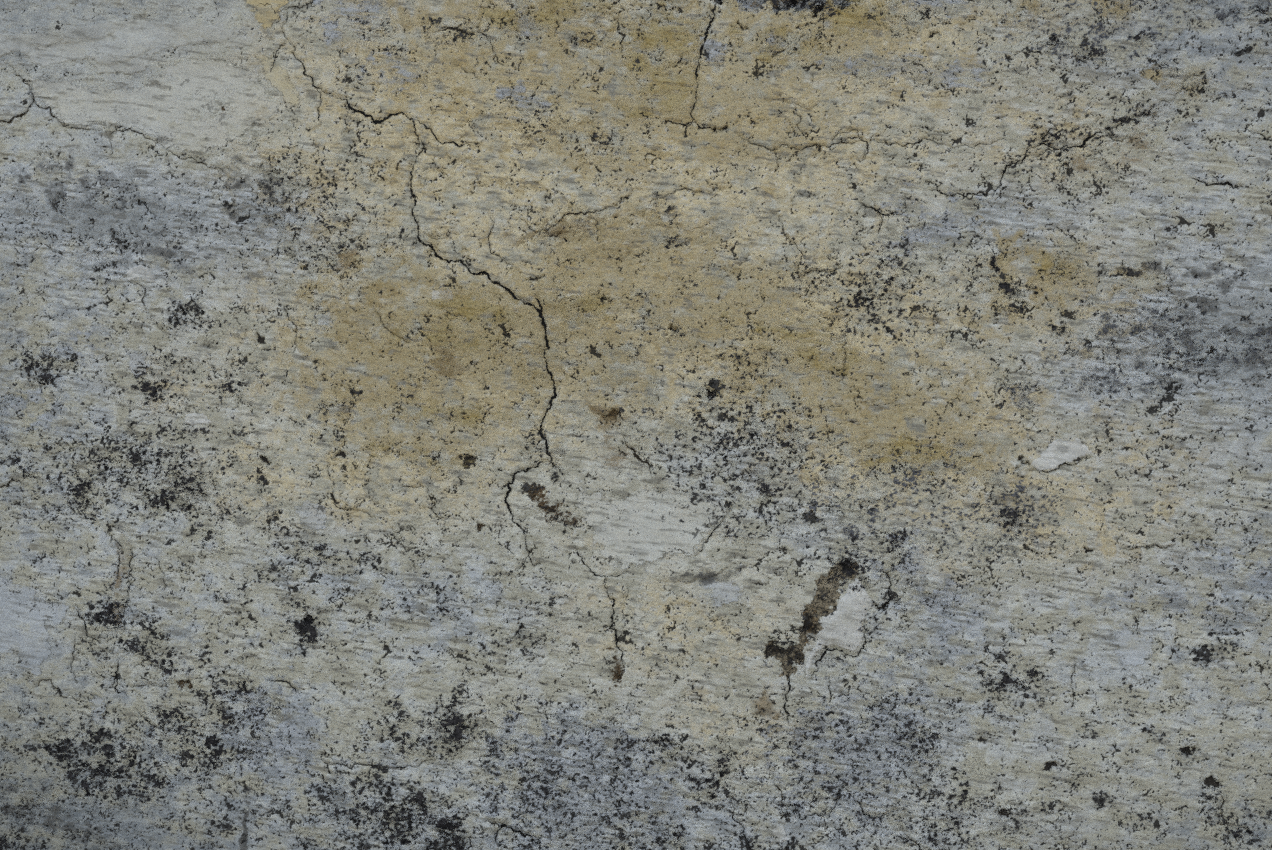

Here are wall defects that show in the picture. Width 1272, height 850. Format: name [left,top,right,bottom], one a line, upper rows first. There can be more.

spalling [738,0,860,18]
crack [0,65,223,172]
crack [258,0,730,571]
crack [575,548,629,683]
peeling [763,559,874,681]